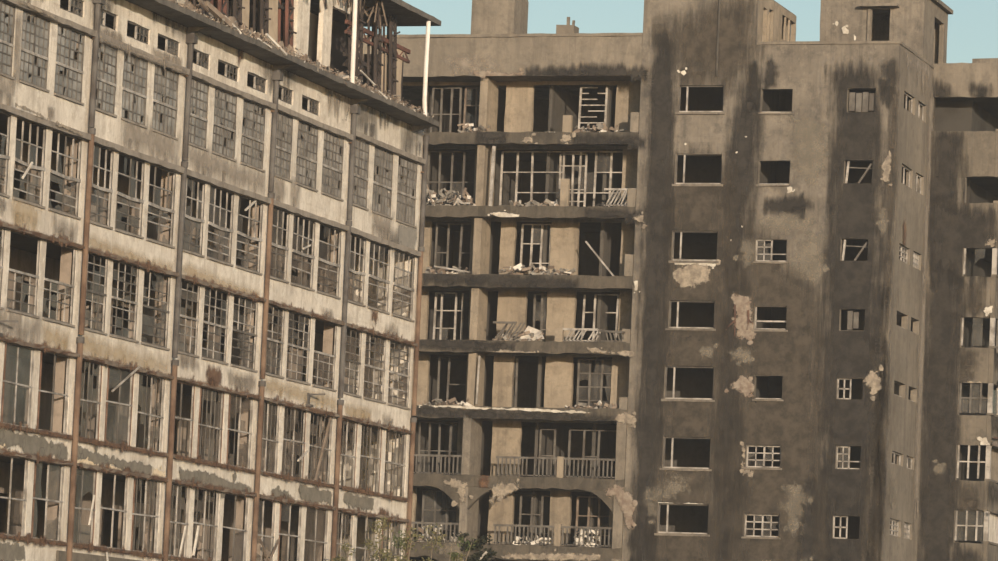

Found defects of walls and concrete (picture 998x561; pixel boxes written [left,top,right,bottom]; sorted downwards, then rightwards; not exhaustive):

spalling [673,259,721,290]
damp [526,0,998,561]
spalling [724,294,756,398]
spalling [863,365,884,401]
peeling [0,428,165,484]
peeling [179,467,252,498]
spalling [443,478,473,507]
spalling [488,478,520,503]
spalling [604,476,697,530]
peeling [0,539,25,561]